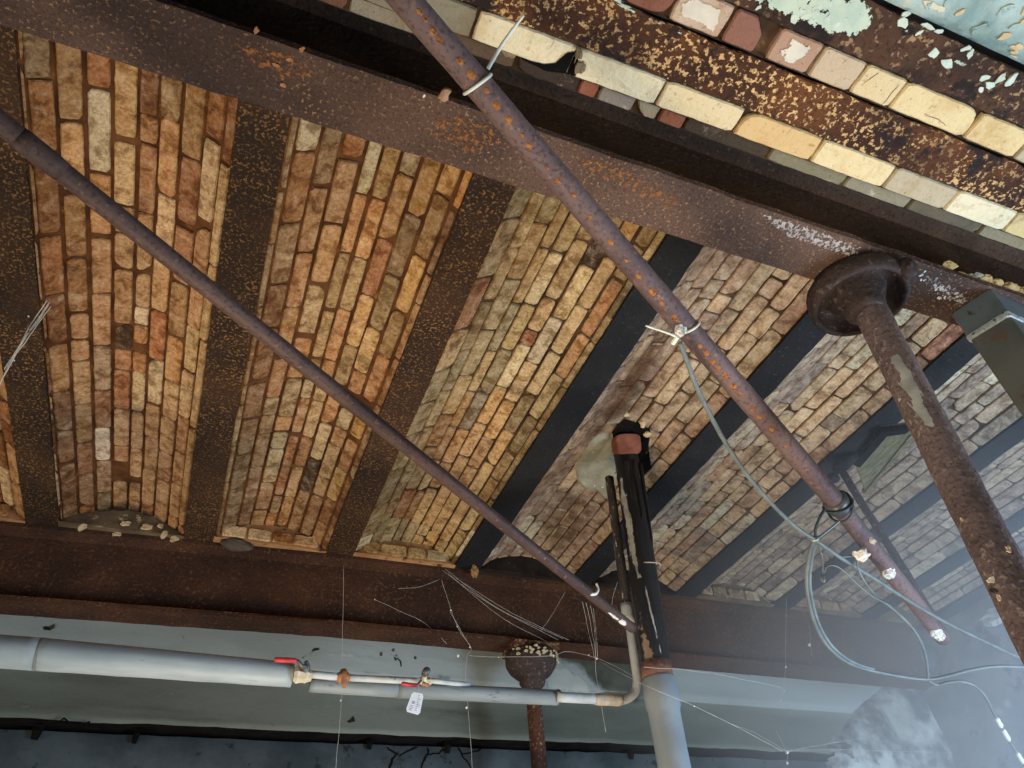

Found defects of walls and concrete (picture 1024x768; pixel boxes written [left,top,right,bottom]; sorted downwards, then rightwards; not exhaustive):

peeling [781,39,810,63]
peeling [755,0,873,36]
peeling [897,11,943,36]
peeling [923,0,965,16]
peeling [928,4,1024,69]
peeling [978,72,1019,93]
corrosion [423,87,501,153]
corrosion [456,0,1024,212]
damp [763,215,859,255]
spalling [611,412,652,473]